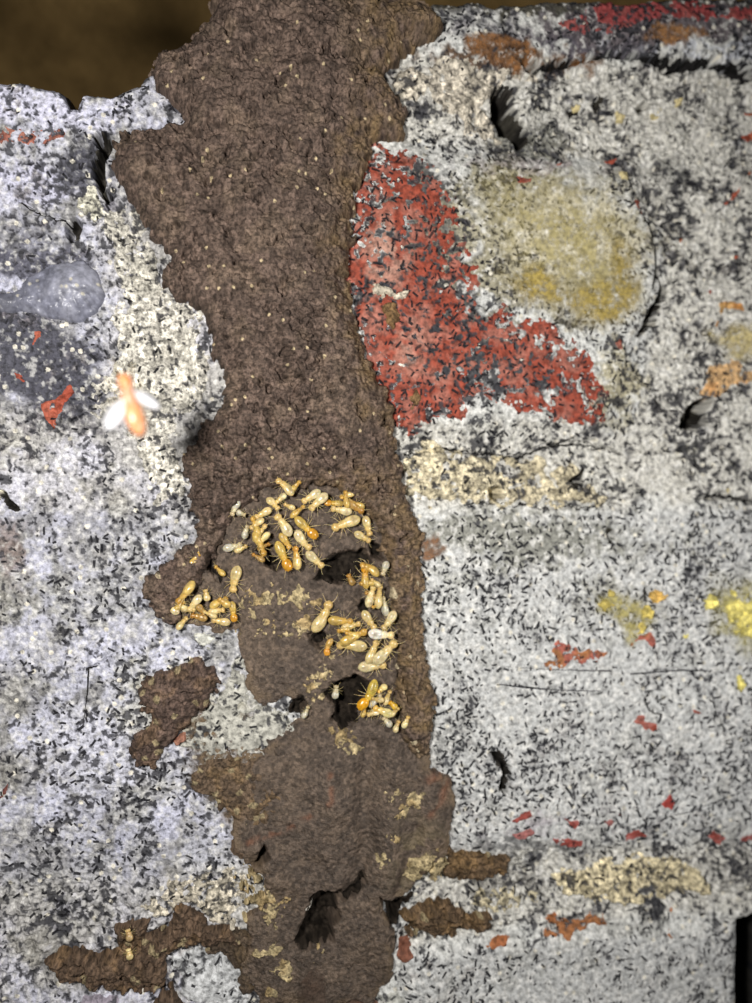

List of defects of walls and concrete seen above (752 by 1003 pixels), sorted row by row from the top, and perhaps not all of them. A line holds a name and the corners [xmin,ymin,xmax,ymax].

peeling [345,142,612,510]
crack [643,217,659,289]